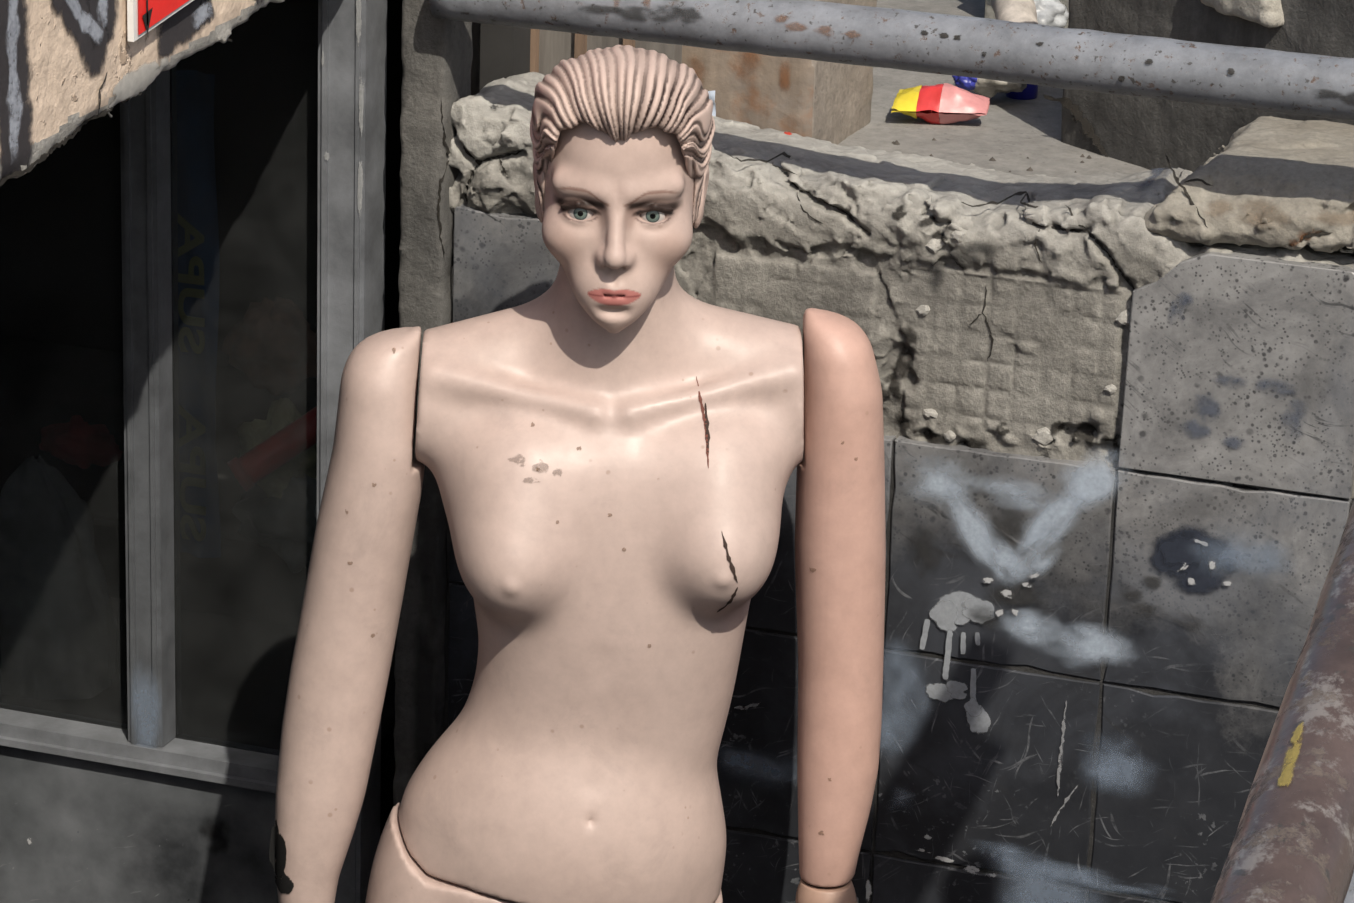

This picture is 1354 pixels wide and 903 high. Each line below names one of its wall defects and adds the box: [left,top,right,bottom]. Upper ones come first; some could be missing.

crack [1165,155,1213,227]
spalling [892,205,906,220]
spalling [920,215,966,253]
crack [969,287,994,361]
spalling [1116,310,1130,326]
spalling [881,305,1010,449]
spalling [1032,421,1120,463]